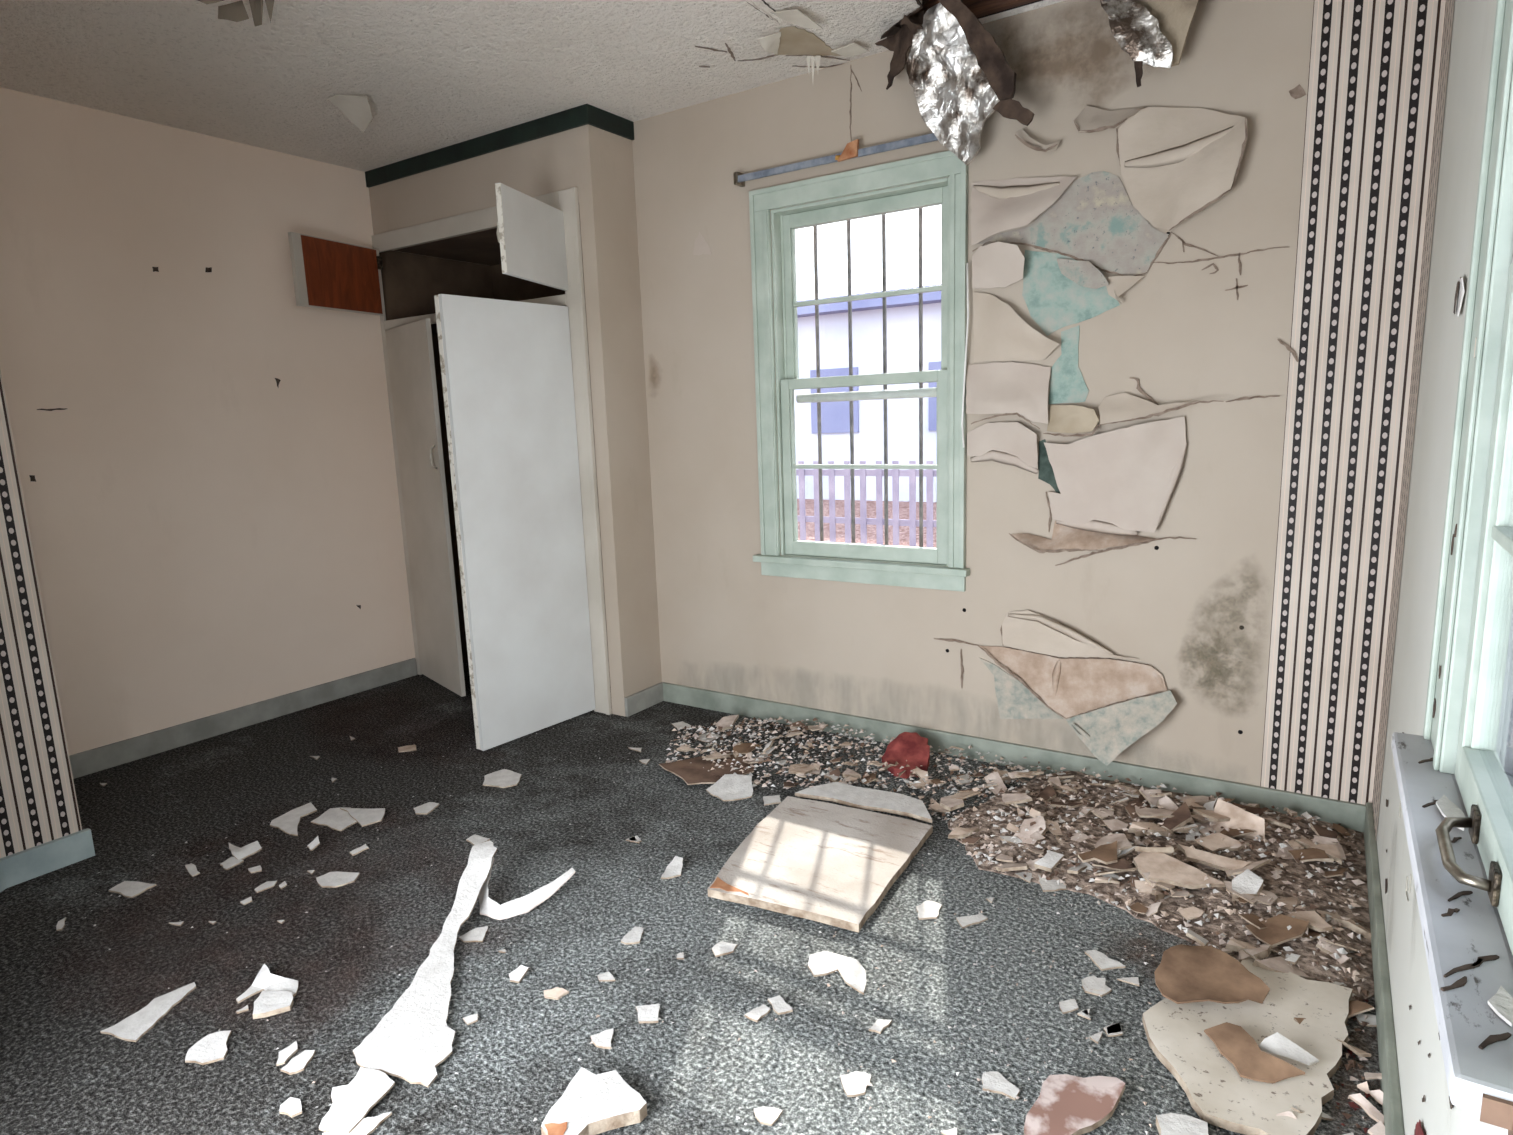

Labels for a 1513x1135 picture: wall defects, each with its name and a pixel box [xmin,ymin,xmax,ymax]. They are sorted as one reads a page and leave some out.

peeling [198,0,274,26]
crack [745,0,780,25]
peeling [966,106,1280,566]
peeling [934,610,1178,766]